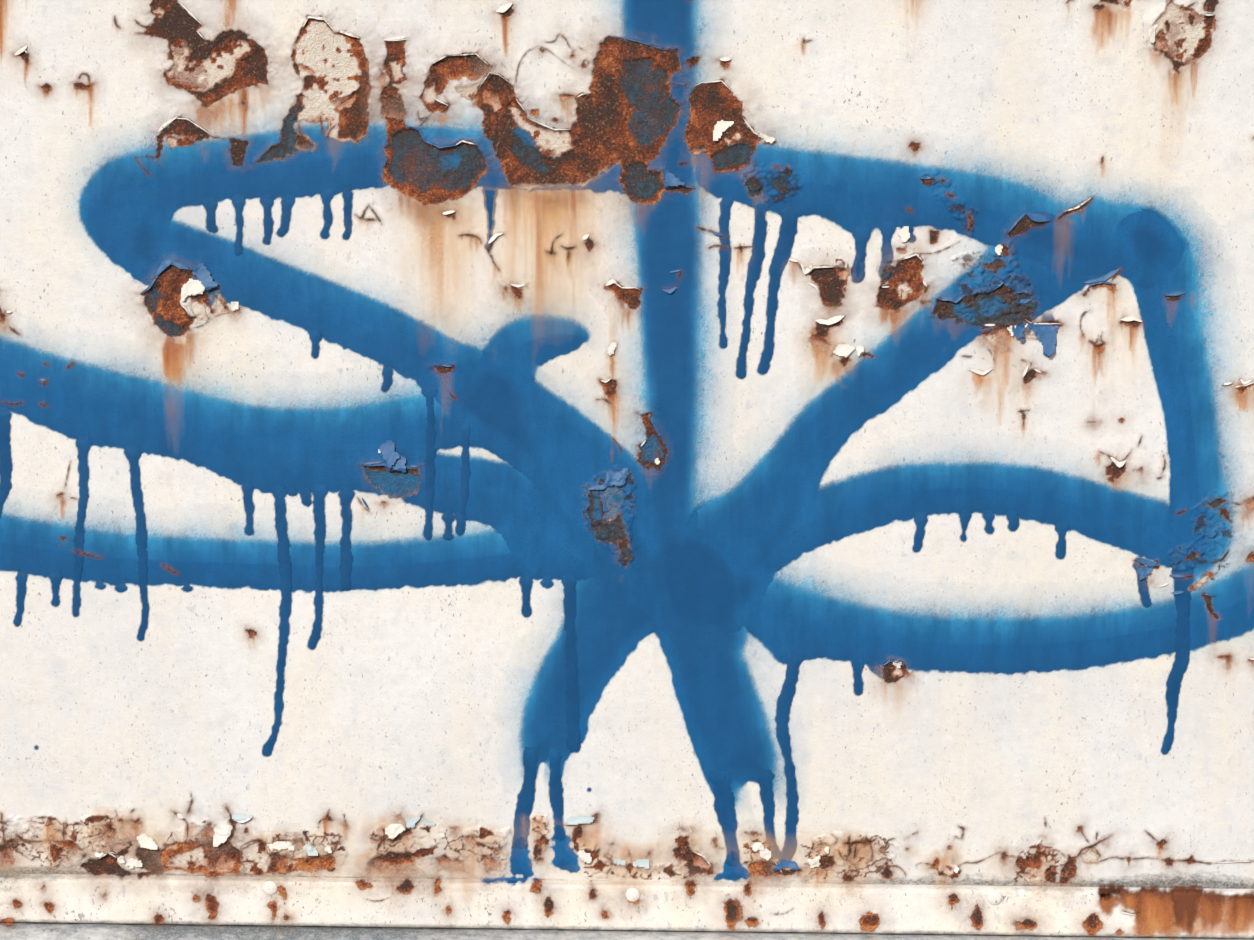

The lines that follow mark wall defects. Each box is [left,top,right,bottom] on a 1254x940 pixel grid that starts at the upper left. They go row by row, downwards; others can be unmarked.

peeling [496,2,514,51]
rust [135,0,268,166]
peeling [530,93,575,122]
rust [377,36,776,237]
peeling [745,165,796,201]
peeling [358,440,420,511]
peeling [586,412,667,567]
peeling [1133,496,1254,619]
rust [80,832,243,879]
rust [672,828,715,896]
rust [1014,817,1078,884]
rust [1082,884,1254,936]